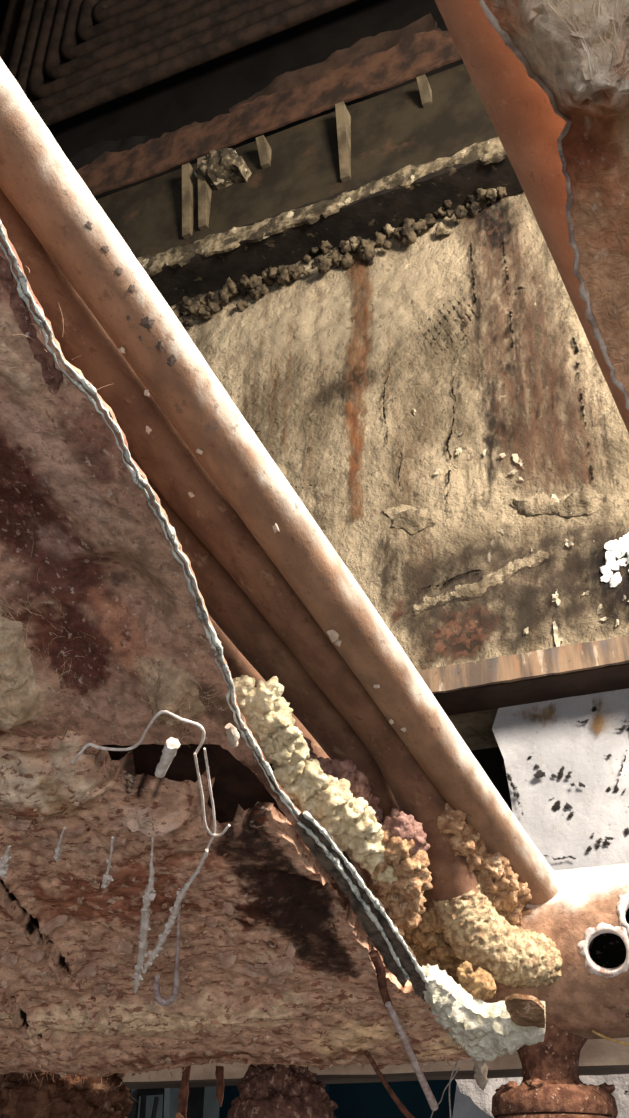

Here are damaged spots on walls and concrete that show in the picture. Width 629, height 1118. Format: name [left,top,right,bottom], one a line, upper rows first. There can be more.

corrosion [0,439,50,549]
corrosion [346,252,373,522]
crack [443,359,482,515]
leakage [460,198,614,495]
crack [421,569,482,606]
leakage [378,520,629,659]
corrosion [49,609,130,695]
crack [11,996,42,1038]
crack [0,879,71,975]
peeling [39,915,125,1037]
peeling [68,859,223,997]